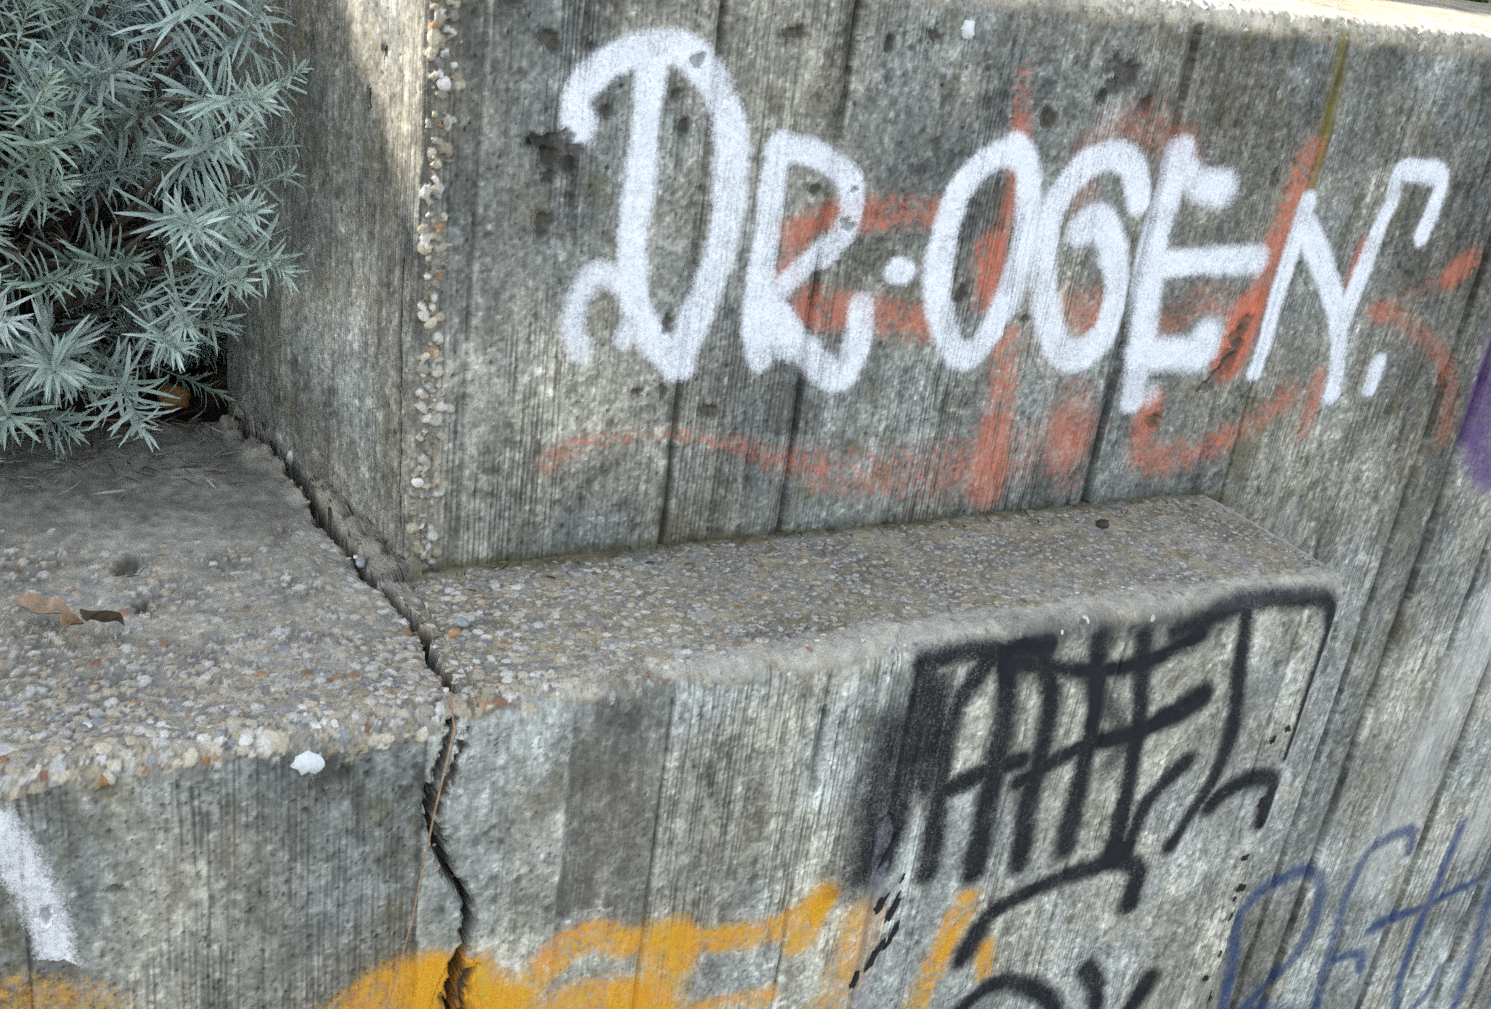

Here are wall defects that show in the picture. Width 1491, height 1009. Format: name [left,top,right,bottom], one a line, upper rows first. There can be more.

crack [396,256,404,528]
crack [229,405,481,996]